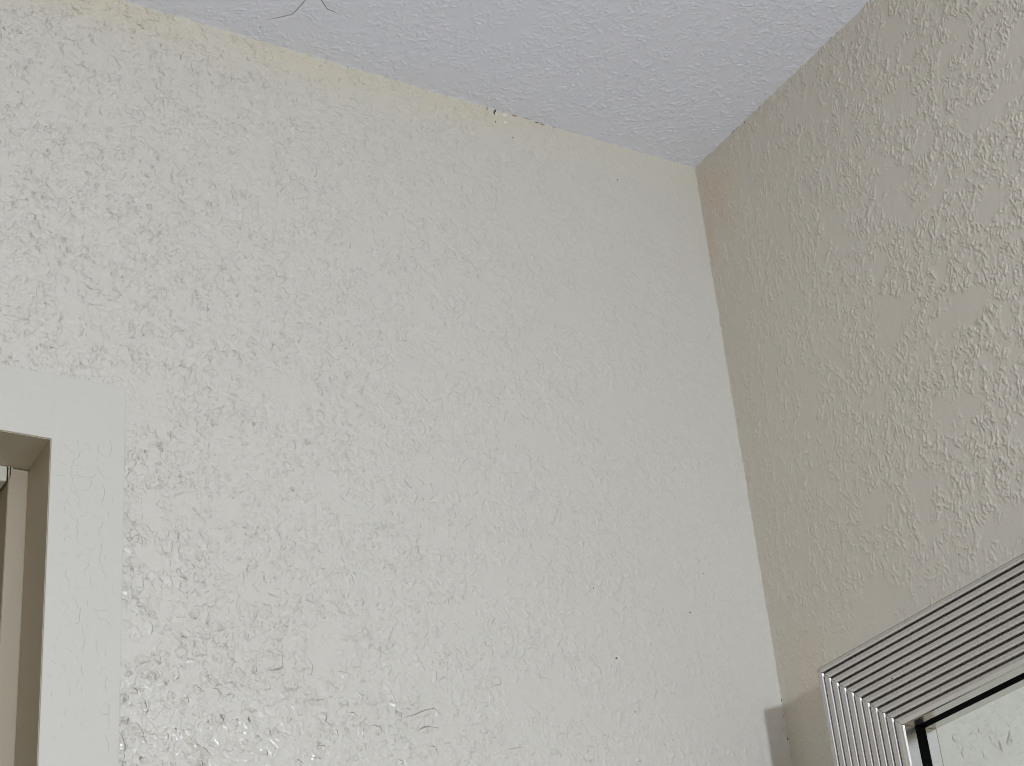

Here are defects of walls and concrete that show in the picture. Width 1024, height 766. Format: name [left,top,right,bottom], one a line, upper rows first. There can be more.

crack [267,0,338,20]